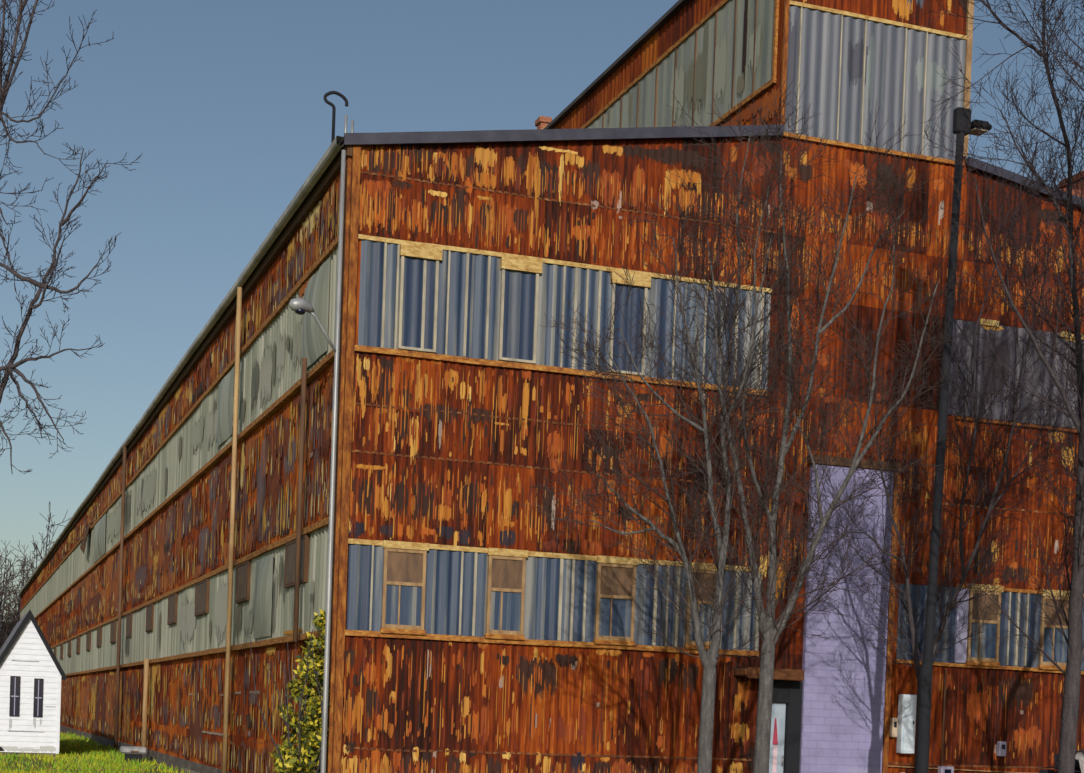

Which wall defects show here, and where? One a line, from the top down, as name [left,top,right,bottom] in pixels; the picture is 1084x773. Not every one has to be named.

peeling [360,144,723,270]
rust [360,144,1084,366]
peeling [793,207,982,300]
peeling [38,380,333,644]
rust [40,363,334,646]
peeling [348,355,660,550]
rust [350,357,1078,590]
rust [60,648,324,773]
peeling [340,641,487,773]
rust [341,636,697,773]
peeling [578,653,684,773]
rust [932,668,1061,765]